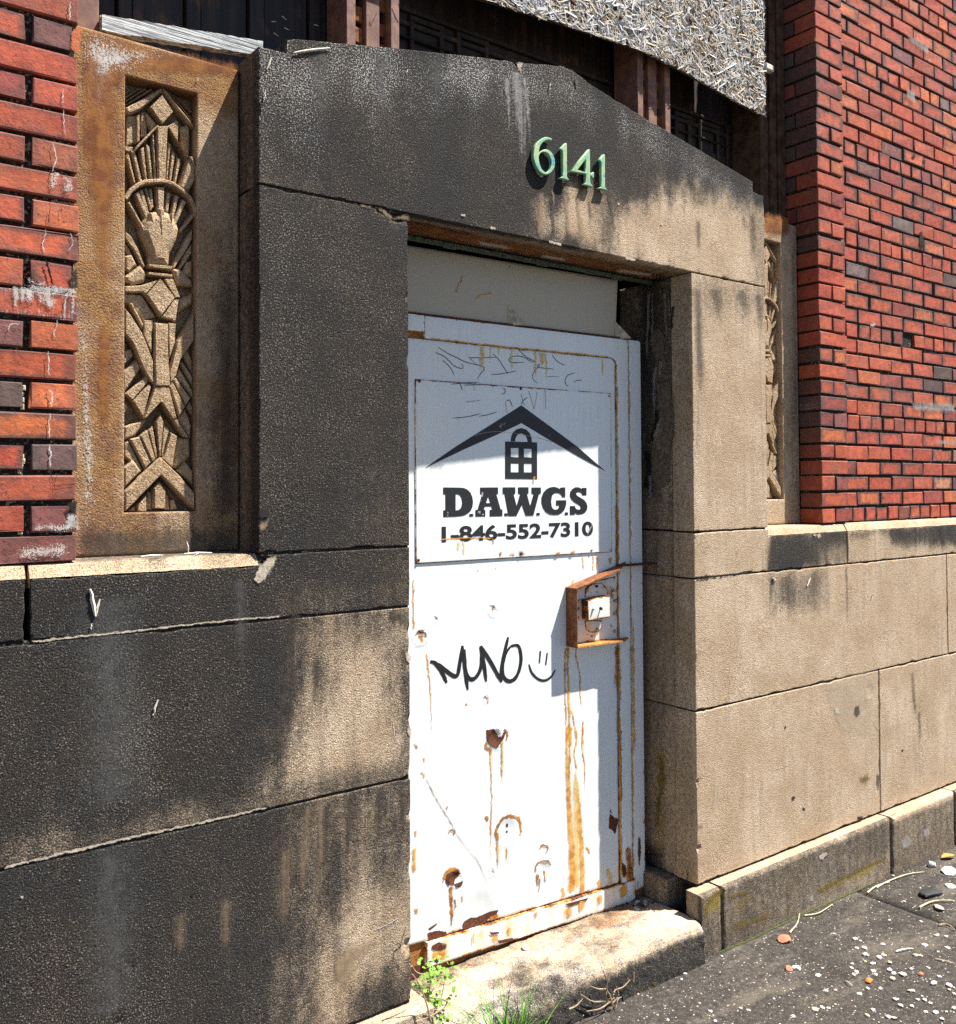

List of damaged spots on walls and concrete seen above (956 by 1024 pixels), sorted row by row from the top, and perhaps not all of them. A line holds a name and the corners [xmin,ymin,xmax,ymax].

corrosion [432,338,607,375]
spalling [254,556,276,583]
corrosion [412,580,427,642]
corrosion [556,346,636,918]
corrosion [485,741,522,863]
corrosion [535,844,552,892]
corrosion [449,886,463,925]